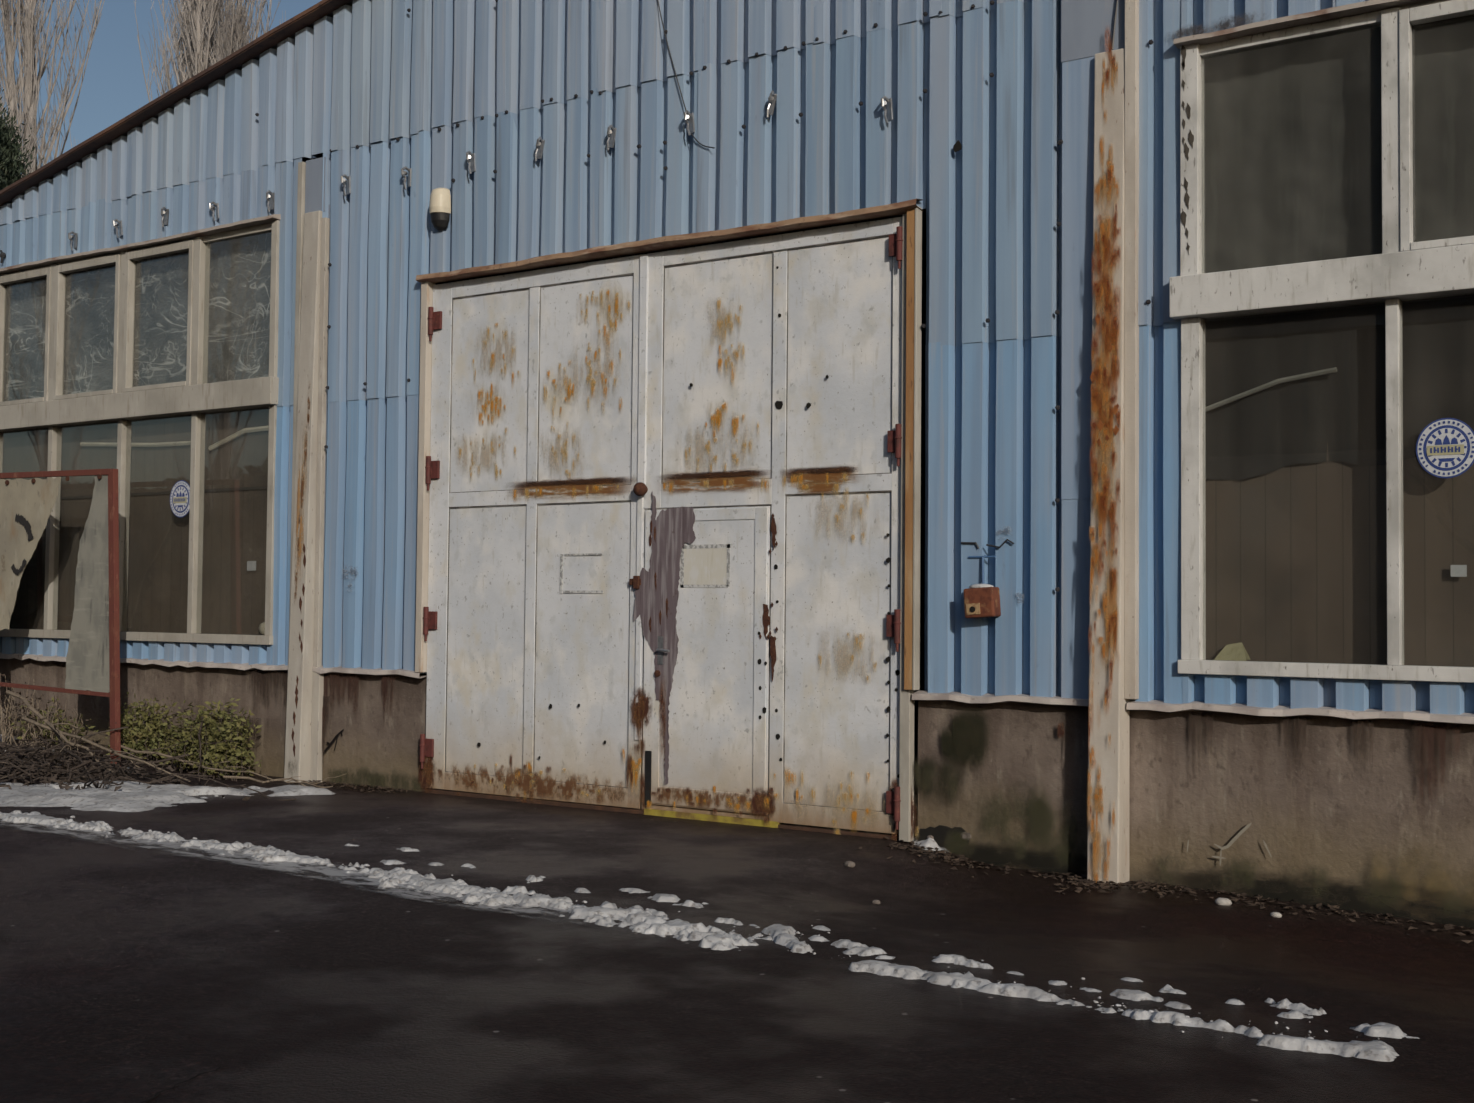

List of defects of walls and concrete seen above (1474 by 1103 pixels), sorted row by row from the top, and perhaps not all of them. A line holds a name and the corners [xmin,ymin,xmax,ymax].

corrosion [1102,29,1118,117]
corrosion [459,323,519,476]
corrosion [514,290,630,498]
corrosion [717,300,745,380]
corrosion [663,403,869,523]
corrosion [1087,138,1121,883]
peeling [649,572,668,632]
corrosion [419,690,815,823]
leakage [916,711,988,800]
leakage [947,801,1084,875]